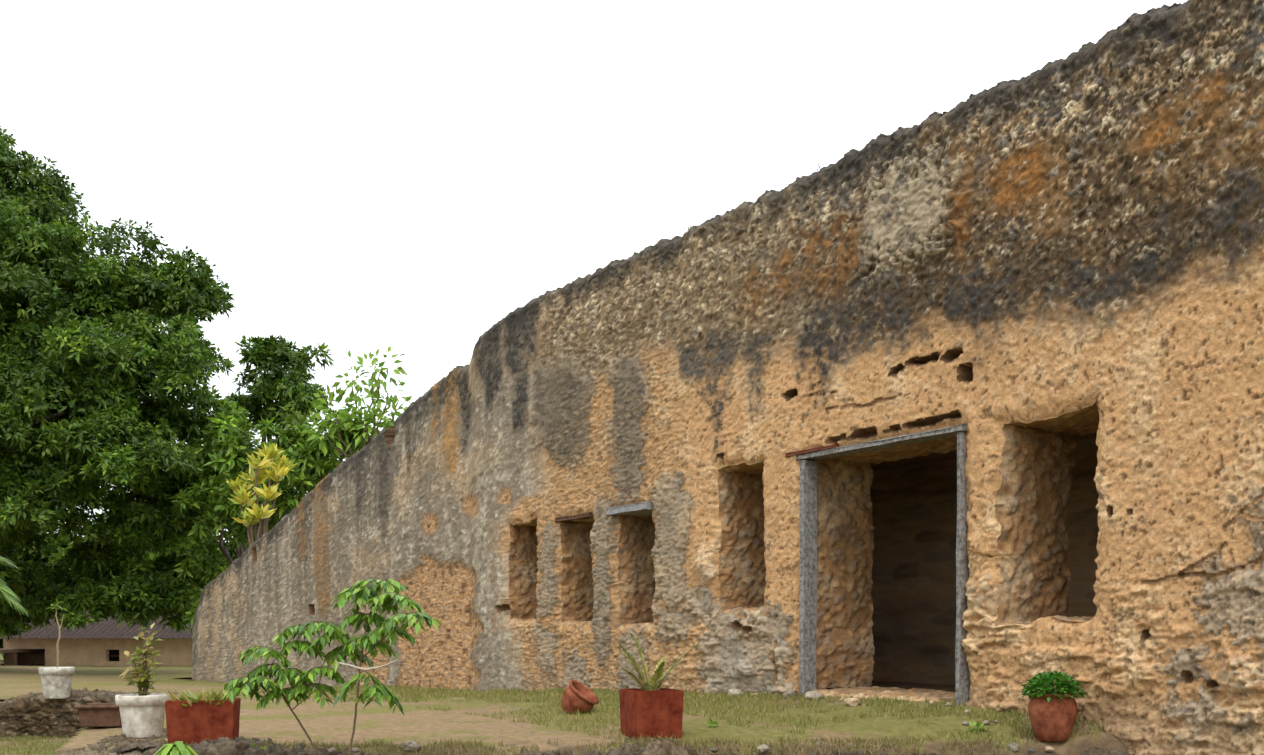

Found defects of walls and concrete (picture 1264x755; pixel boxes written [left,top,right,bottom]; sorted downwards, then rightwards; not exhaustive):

leakage [1044,227,1178,317]
leakage [800,264,1019,385]
leakage [458,304,584,455]
leakage [679,333,771,452]
crack [1132,493,1264,585]
peeling [1230,484,1264,542]
peeling [651,572,753,648]
peeling [1162,668,1255,743]